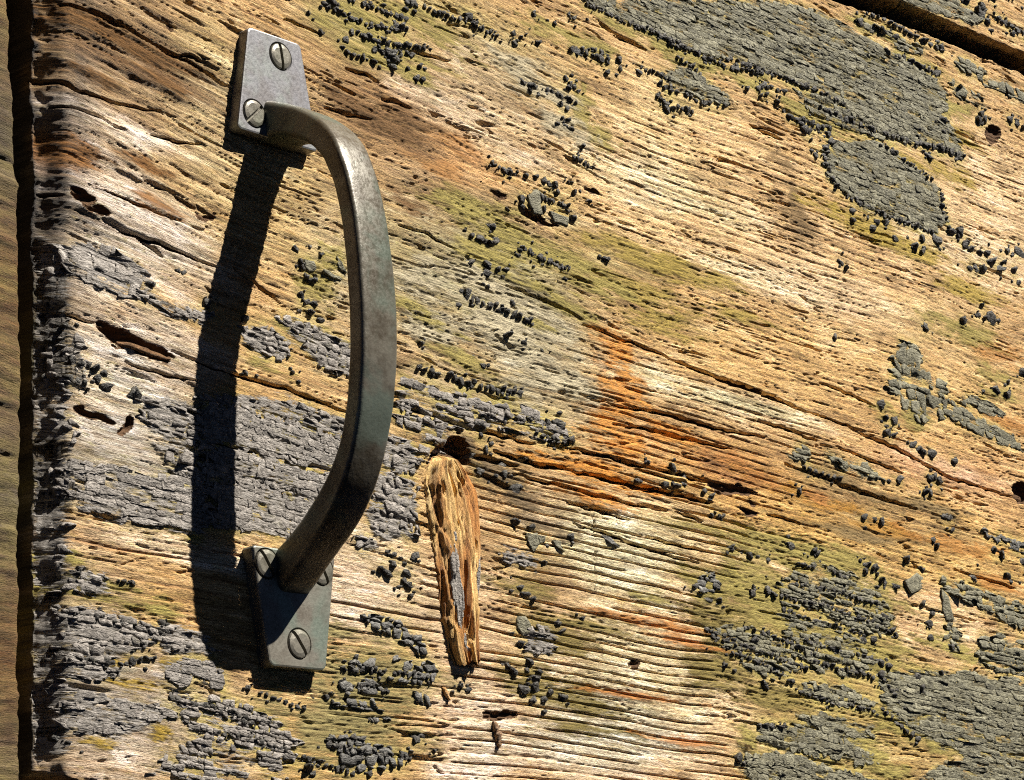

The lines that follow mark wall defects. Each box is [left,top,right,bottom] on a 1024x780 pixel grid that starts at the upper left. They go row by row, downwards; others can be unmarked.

peeling [306,0,1024,286]
crack [91,182,183,220]
peeling [456,240,571,351]
peeling [959,303,1001,327]
peeling [30,235,439,780]
peeling [353,355,575,599]
peeling [786,444,905,496]
peeling [860,513,885,530]
peeling [877,339,1024,501]
peeling [684,571,725,609]
peeling [449,681,472,696]
peeling [704,527,1024,780]